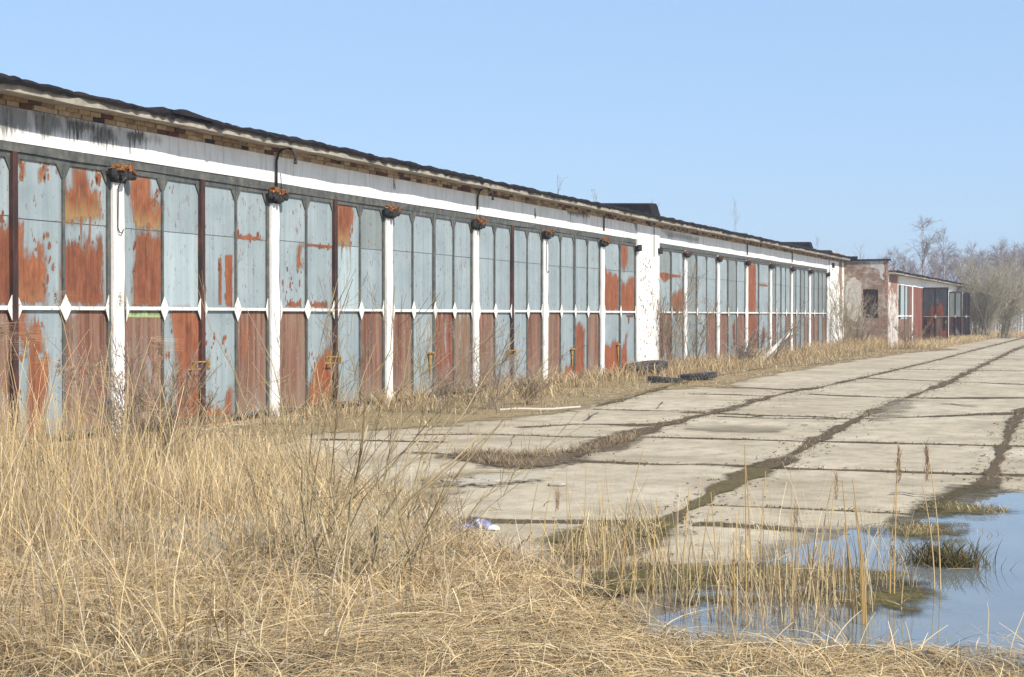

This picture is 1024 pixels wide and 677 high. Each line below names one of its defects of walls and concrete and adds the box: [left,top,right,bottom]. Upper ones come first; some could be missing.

damp [65,117,114,145]
damp [128,130,143,154]
corrosion [0,167,104,441]
corrosion [130,177,161,307]
corrosion [218,255,233,306]
corrosion [282,204,353,308]
corrosion [605,244,634,375]
corrosion [731,263,768,360]
flaking render [831,261,862,321]
flaking render [869,261,898,307]
corrosion [308,348,332,411]
corrosion [562,321,585,380]